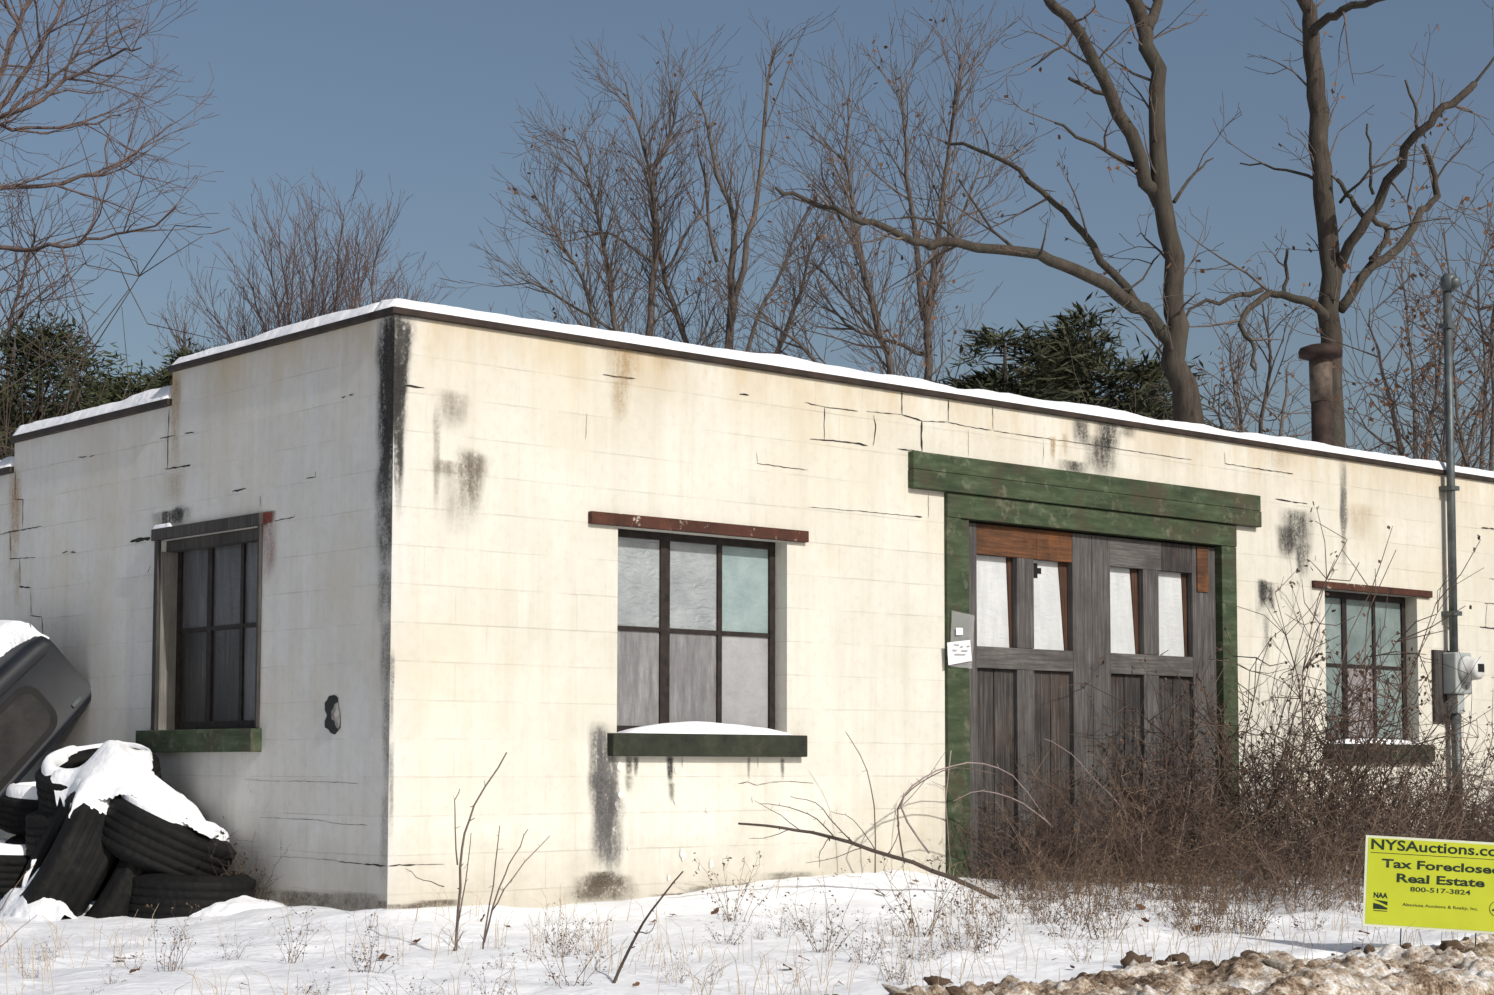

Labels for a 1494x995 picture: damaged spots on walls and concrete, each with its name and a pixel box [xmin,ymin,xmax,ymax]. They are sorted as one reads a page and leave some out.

crack [0,477,75,633]
water stain [377,315,412,558]
water stain [437,455,481,494]
water stain [1280,513,1307,568]
spalling [325,695,340,735]
water stain [579,729,638,900]